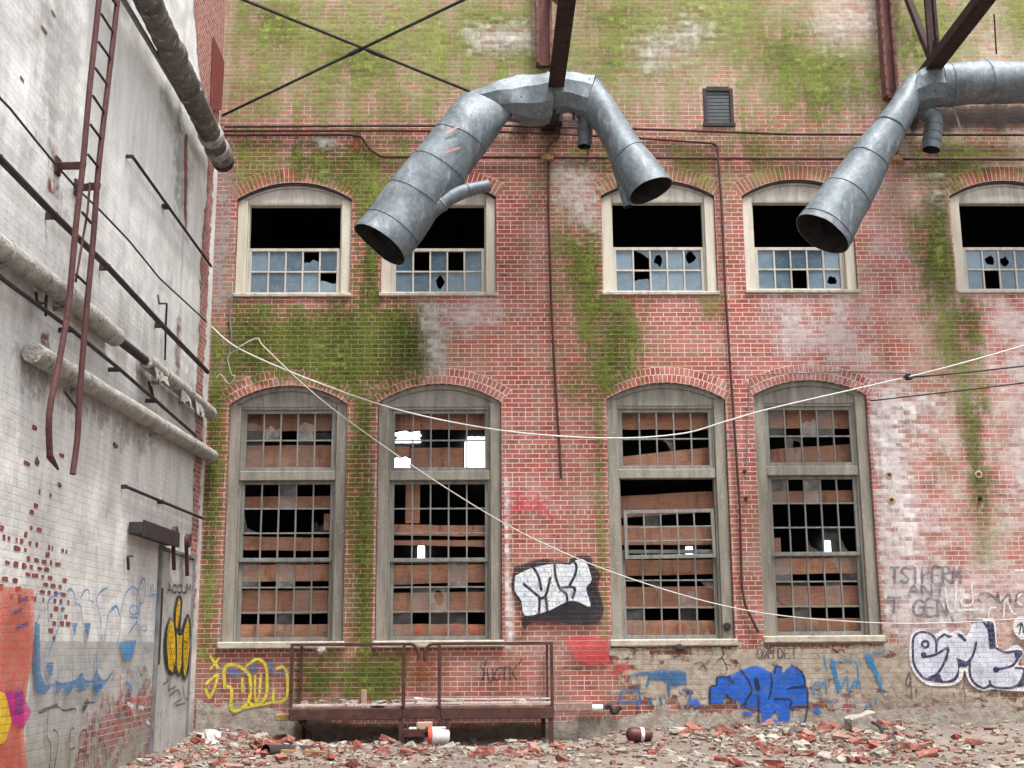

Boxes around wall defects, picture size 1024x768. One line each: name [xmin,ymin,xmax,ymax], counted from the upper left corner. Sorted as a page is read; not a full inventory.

peeling [0,482,71,640]
leakage [870,390,1024,639]
flaking render [71,668,153,768]